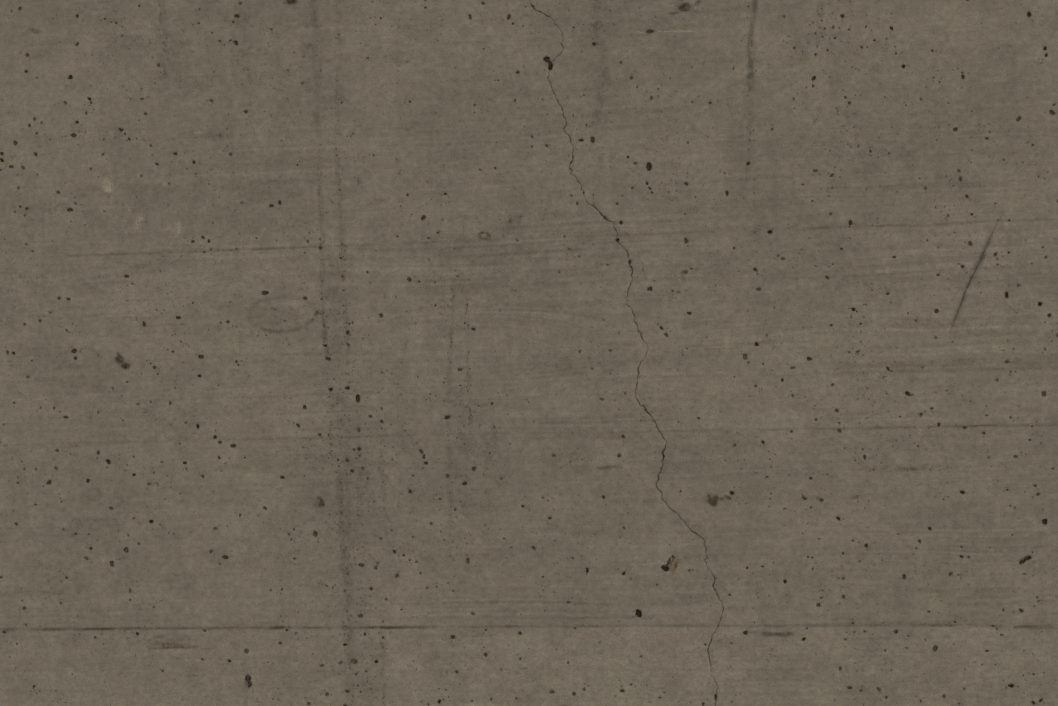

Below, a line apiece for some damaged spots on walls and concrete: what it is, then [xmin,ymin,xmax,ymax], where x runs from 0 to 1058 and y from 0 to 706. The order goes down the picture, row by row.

crack [530,2,724,706]